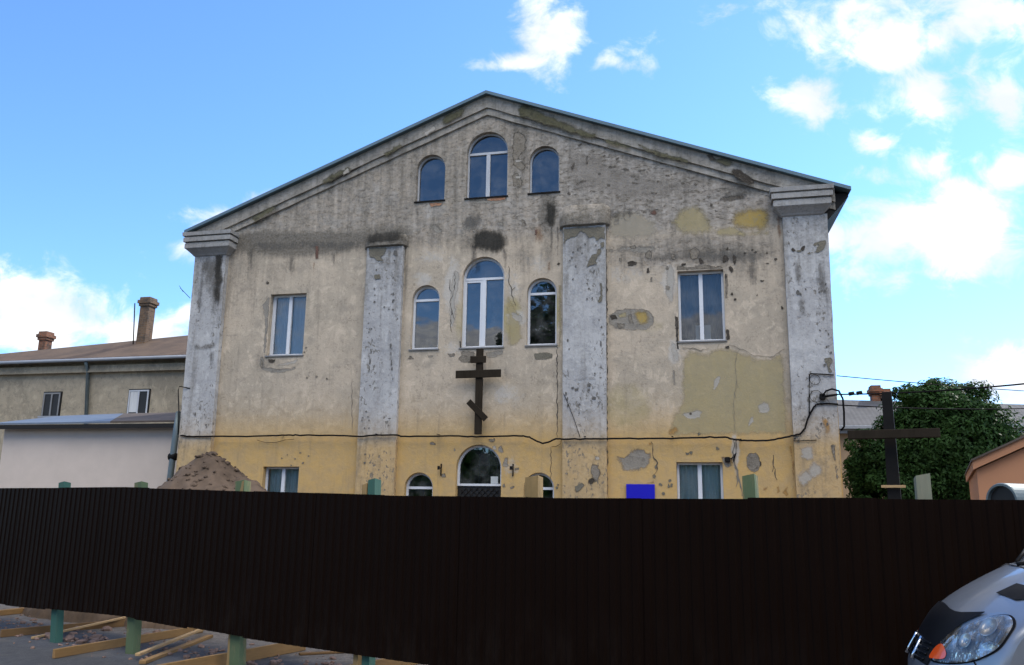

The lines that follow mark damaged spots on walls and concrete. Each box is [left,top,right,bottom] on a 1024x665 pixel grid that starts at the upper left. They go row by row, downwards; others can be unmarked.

leakage [465,215,505,267]
leakage [547,203,558,238]
peeling [717,209,767,235]
leakage [199,255,222,307]
peeling [598,309,654,330]
crack [687,345,784,490]
flaking render [575,457,600,492]
peeling [619,449,673,495]
flaking render [747,453,761,472]
flaking render [799,447,821,485]